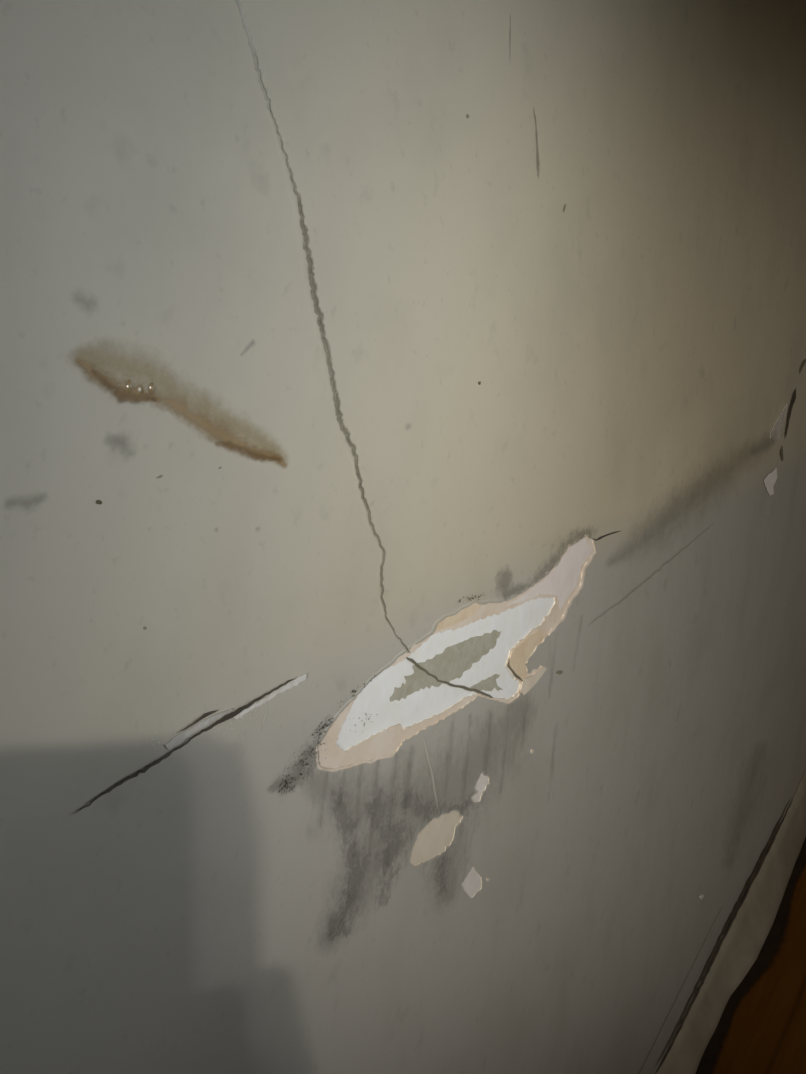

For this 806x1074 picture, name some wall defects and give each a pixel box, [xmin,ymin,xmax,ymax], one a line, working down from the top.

crack [235,0,410,653]
rust [77,359,286,466]
flaking render [764,468,777,495]
peeling [316,535,597,772]
crack [76,674,307,813]
leakage [278,675,378,793]
peeling [409,810,463,866]
peeling [461,867,490,898]
peeling [471,773,489,802]